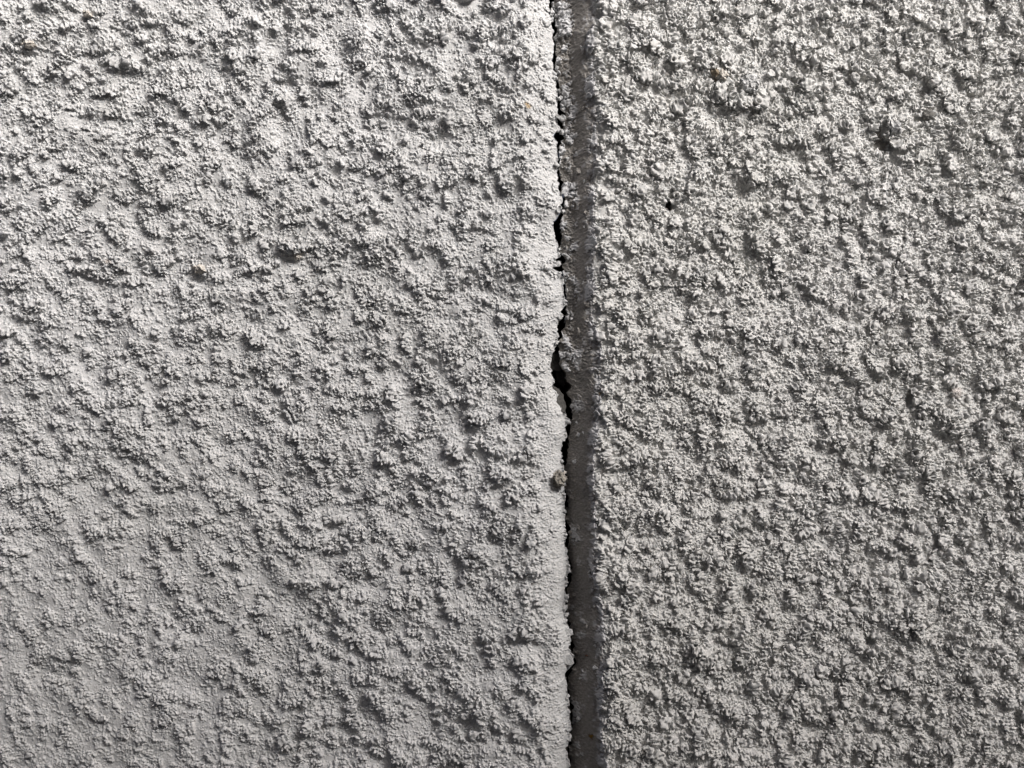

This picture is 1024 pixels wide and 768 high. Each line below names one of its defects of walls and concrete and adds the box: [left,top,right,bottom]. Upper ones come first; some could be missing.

crack [549,0,577,768]